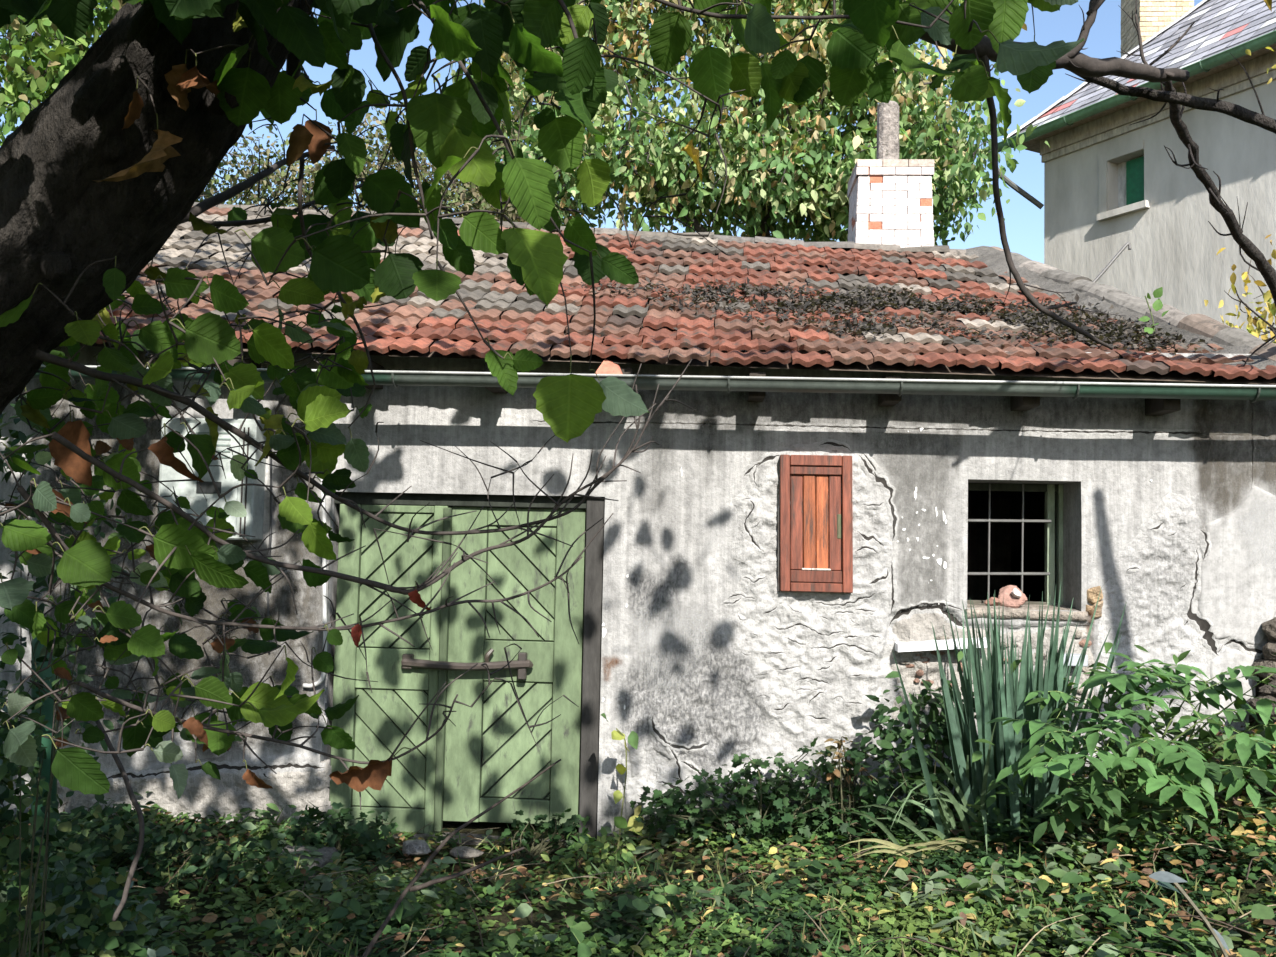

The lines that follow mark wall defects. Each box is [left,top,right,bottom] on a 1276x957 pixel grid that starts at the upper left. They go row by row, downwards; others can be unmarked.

crack [529,418,550,426]
damp [1193,399,1276,506]
peeling [897,487,947,569]
crack [590,406,1269,724]
crack [106,760,326,782]
crack [647,716,713,796]